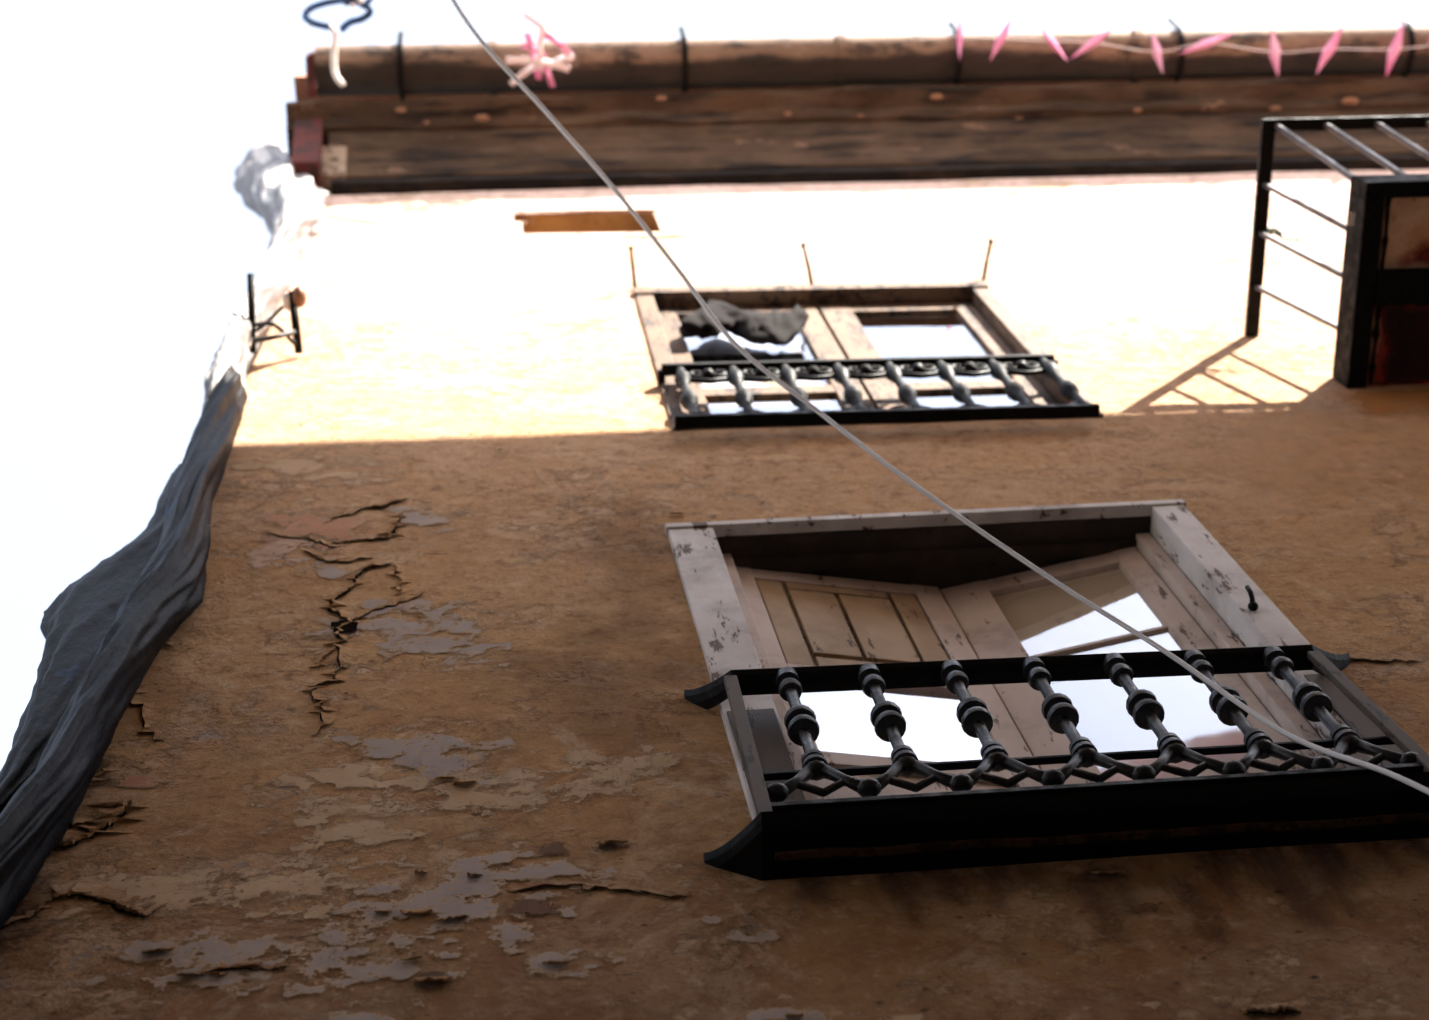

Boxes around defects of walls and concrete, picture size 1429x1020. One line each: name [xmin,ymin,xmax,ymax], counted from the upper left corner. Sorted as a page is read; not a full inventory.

corrosion [1369,305,1429,386]
peeling [222,444,404,491]
flaking render [243,506,377,579]
peeling [386,503,455,537]
crack [268,498,424,736]
peeling [304,597,511,678]
crack [3,768,169,926]
peeling [42,725,694,1020]
crack [507,879,690,898]